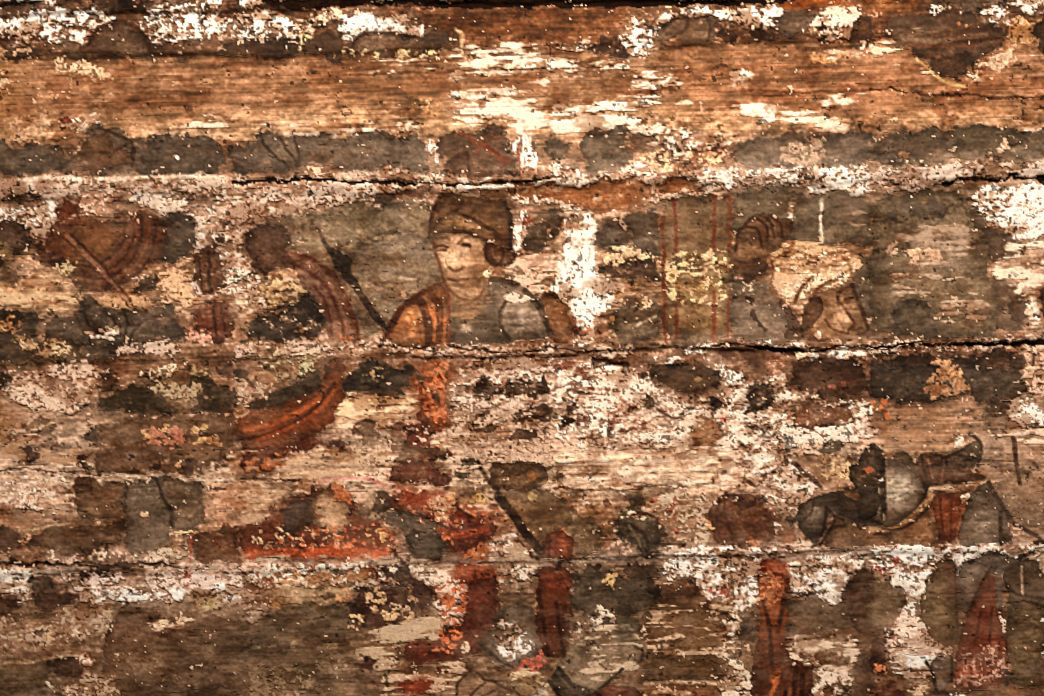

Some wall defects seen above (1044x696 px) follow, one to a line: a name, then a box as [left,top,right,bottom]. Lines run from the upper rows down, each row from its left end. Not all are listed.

peeling [60,22,459,65]
peeling [882,0,1044,83]
crack [232,177,552,190]
peeling [0,116,1044,368]
peeling [85,220,328,479]
crack [448,345,567,354]
peeling [641,361,724,410]
crack [713,339,1044,358]
peeling [0,520,145,576]
peeling [381,456,669,696]
peeling [745,347,1044,696]
peeling [248,580,435,696]